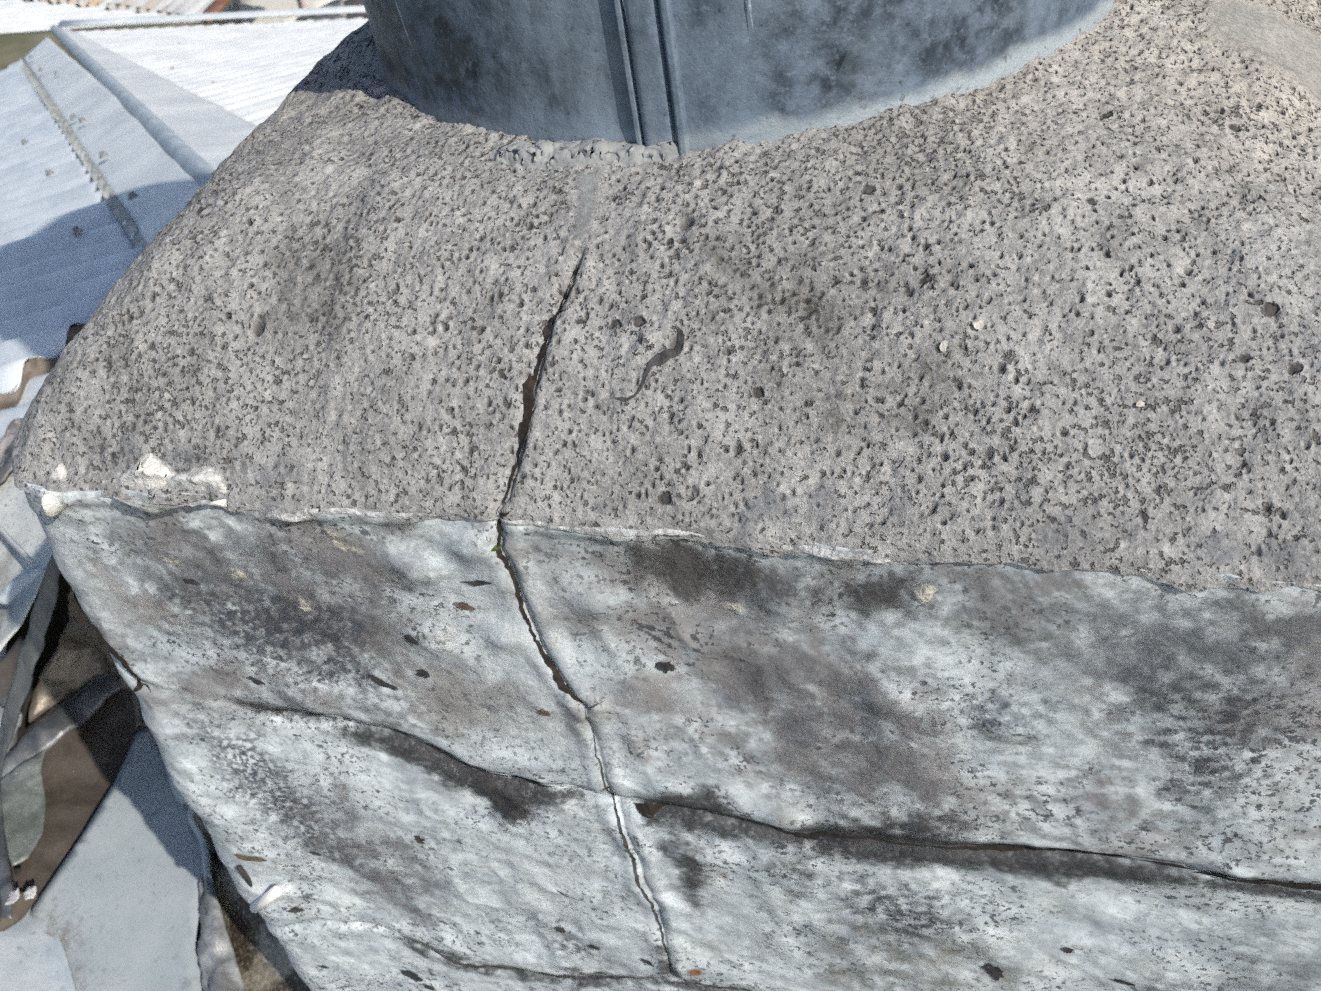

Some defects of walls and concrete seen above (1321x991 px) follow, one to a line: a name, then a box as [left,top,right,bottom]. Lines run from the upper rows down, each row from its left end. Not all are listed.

crack [276,260,749,991]
crack [746,819,1321,891]